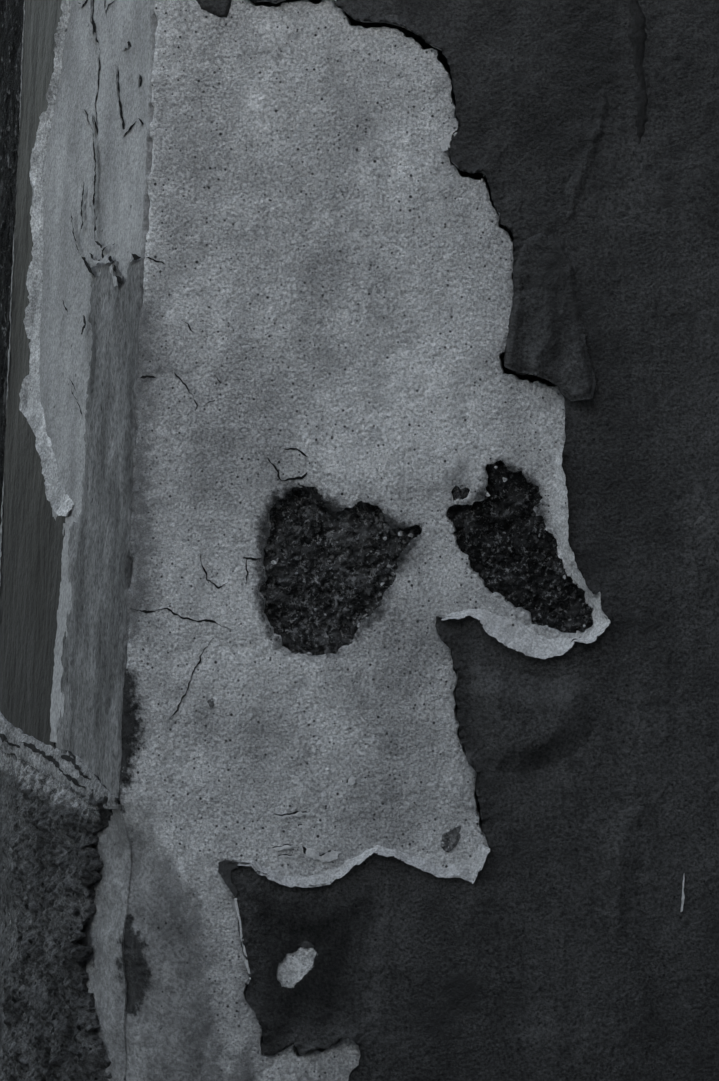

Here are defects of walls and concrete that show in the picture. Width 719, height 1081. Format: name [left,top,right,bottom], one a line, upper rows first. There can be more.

crack [69,0,165,287]
crack [63,301,86,335]
peeling [19,0,158,797]
peeling [119,0,610,1081]
spalling [0,750,113,1081]